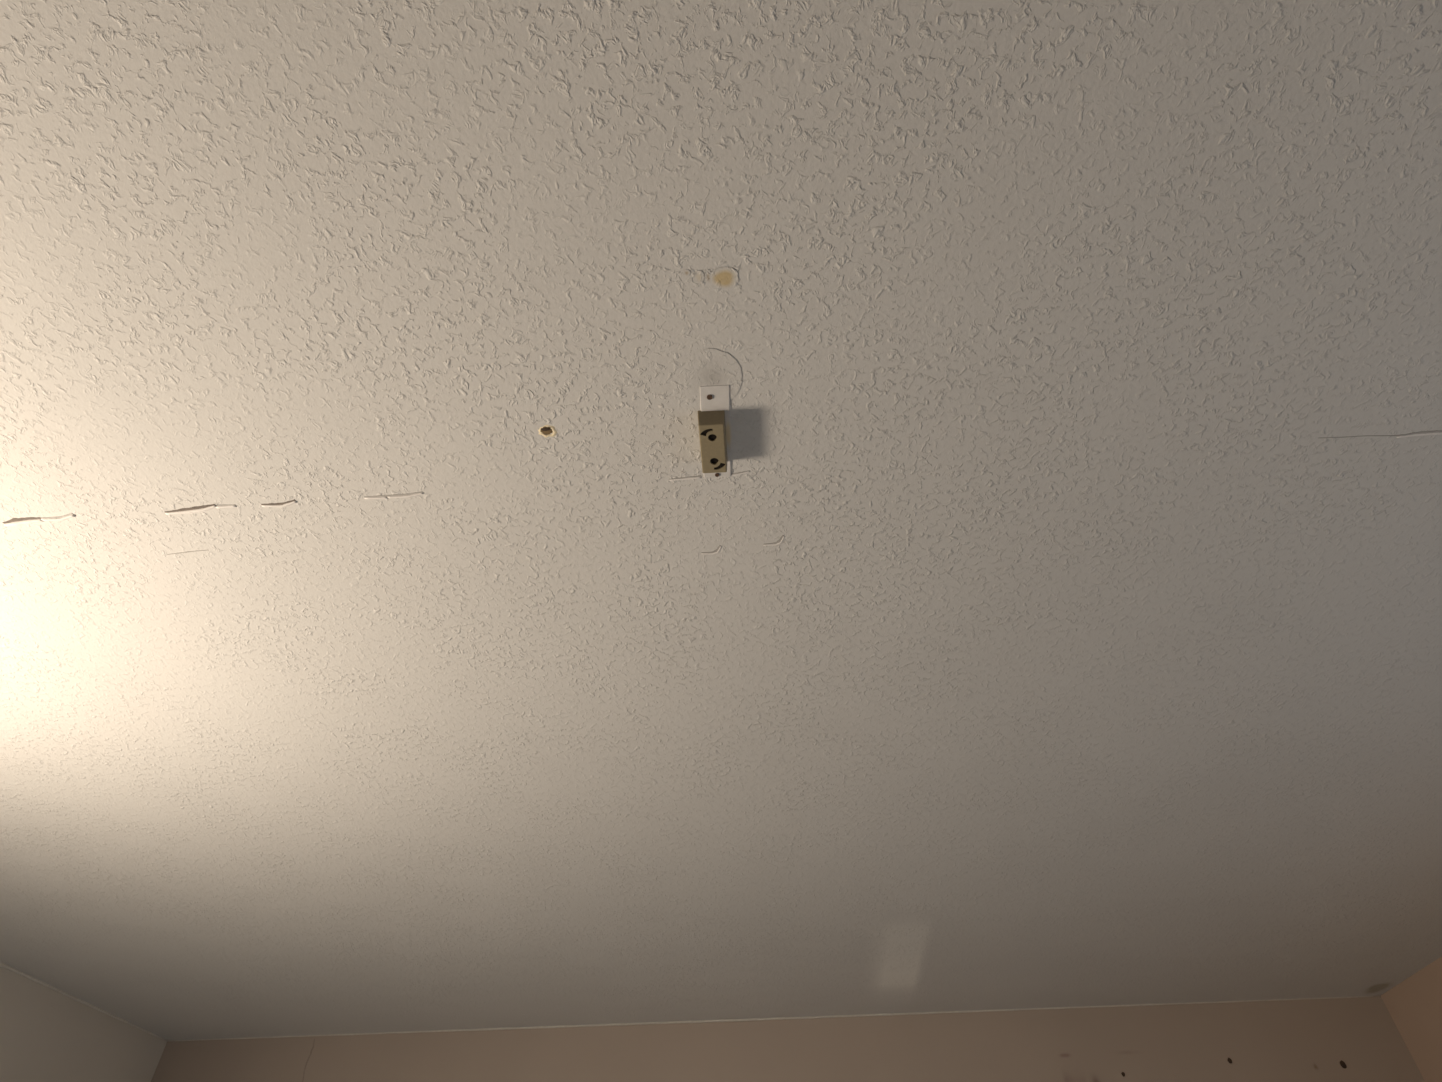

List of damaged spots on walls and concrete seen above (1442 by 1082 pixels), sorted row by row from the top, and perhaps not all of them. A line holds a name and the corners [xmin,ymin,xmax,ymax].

crack [1324,430,1442,438]
crack [364,491,424,499]
crack [165,499,297,515]
crack [2,513,76,527]